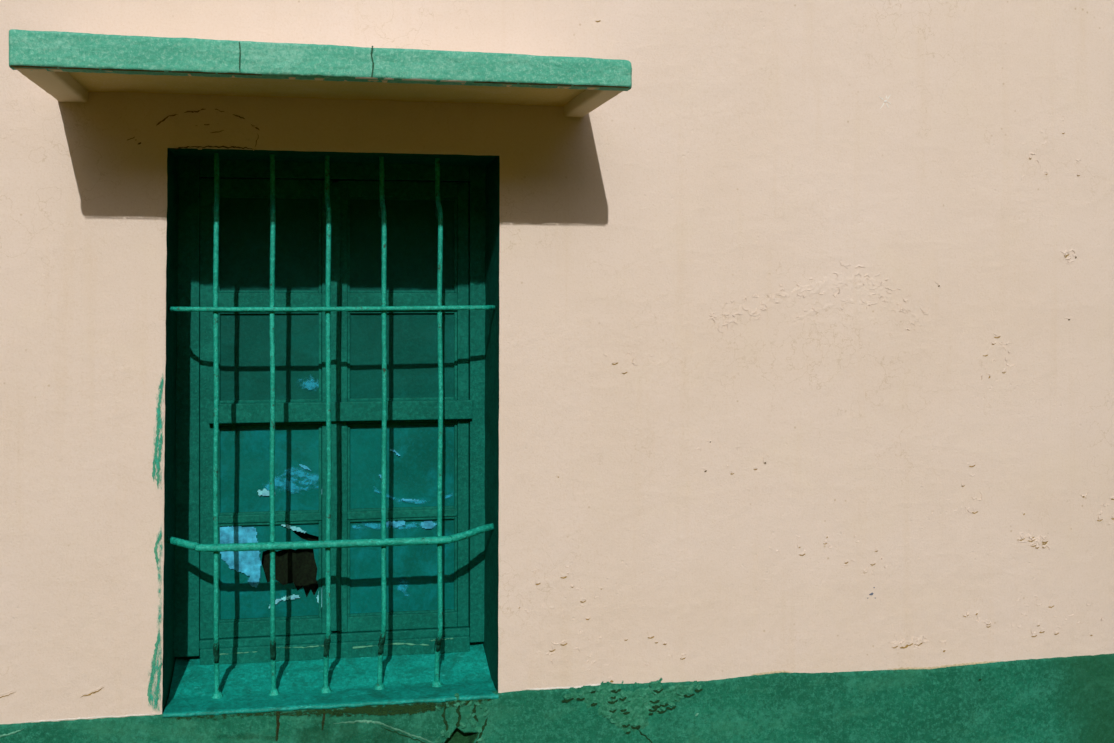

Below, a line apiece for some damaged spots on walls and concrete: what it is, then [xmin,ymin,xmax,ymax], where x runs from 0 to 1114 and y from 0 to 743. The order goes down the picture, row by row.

flaking render [435,693,490,743]
flaking render [530,565,706,734]